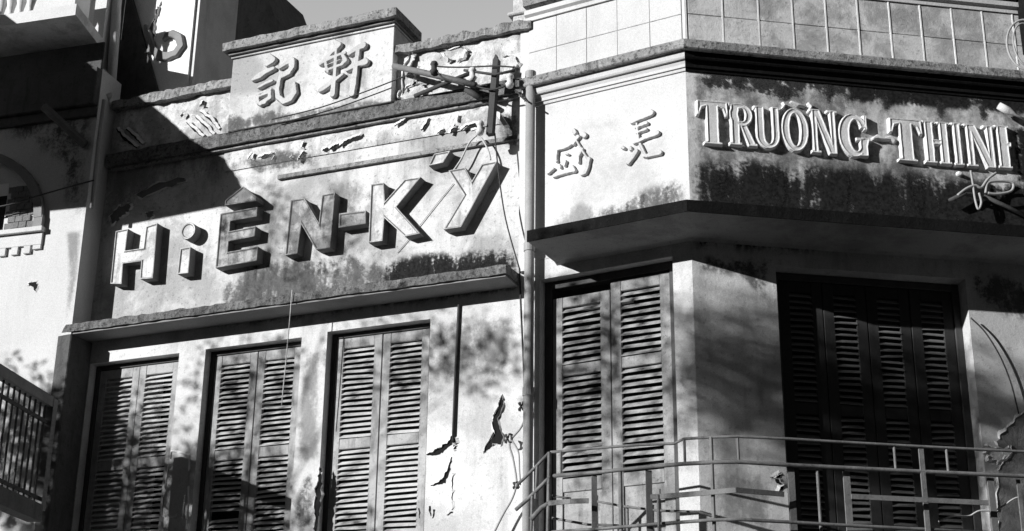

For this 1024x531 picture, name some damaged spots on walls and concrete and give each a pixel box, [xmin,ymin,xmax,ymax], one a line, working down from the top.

spalling [108,176,189,227]
leakage [697,128,1024,225]
leakage [225,251,515,303]
flaking render [483,394,505,454]